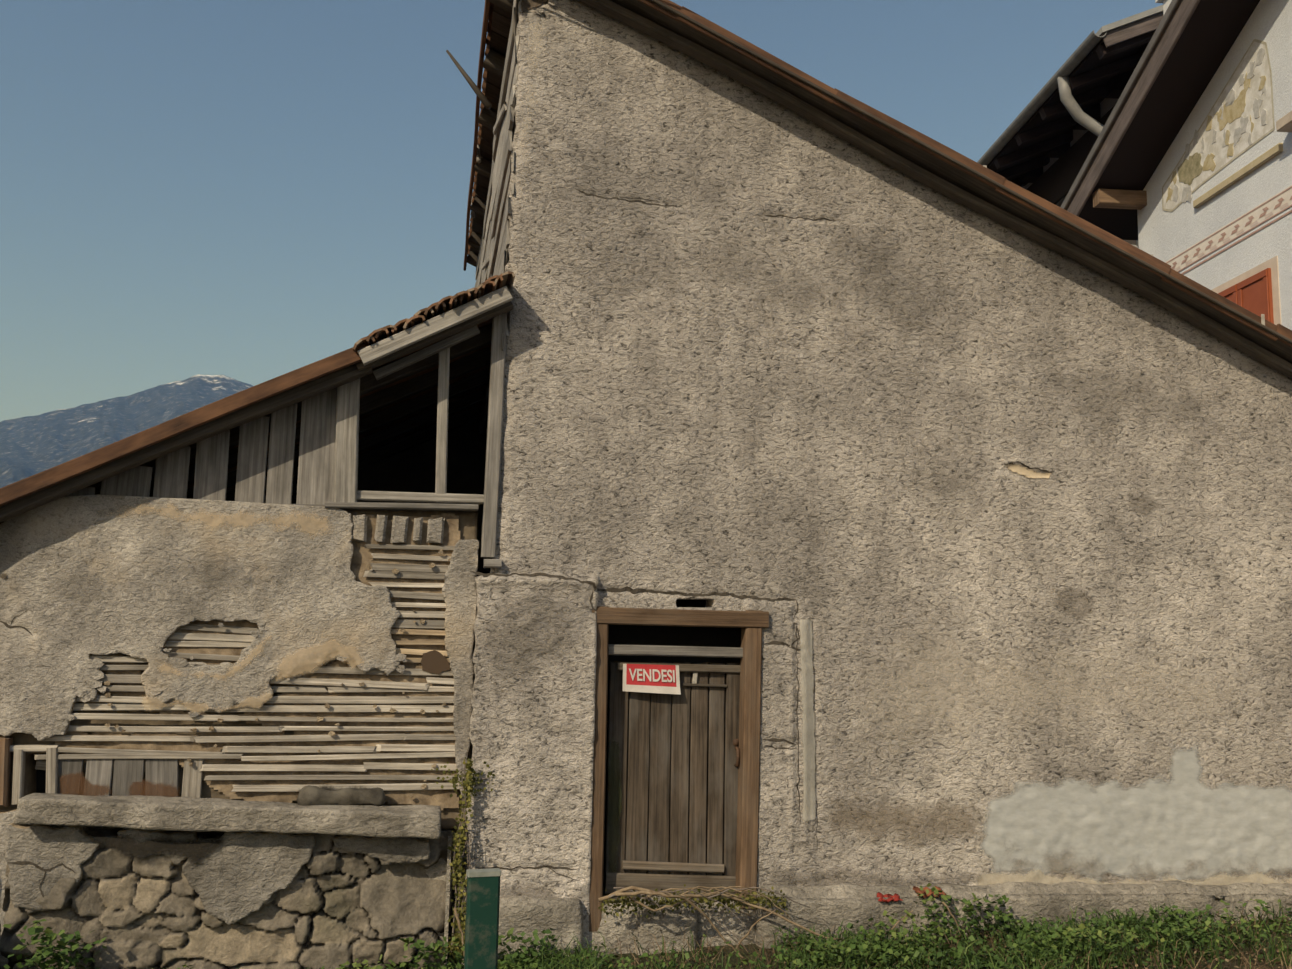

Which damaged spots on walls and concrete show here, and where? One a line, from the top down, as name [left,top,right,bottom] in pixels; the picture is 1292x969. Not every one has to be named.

crack [577,189,682,207]
crack [761,213,833,221]
spalling [1005,461,1052,478]
crack [0,611,32,635]
peeling [35,513,460,810]
crack [471,571,818,837]